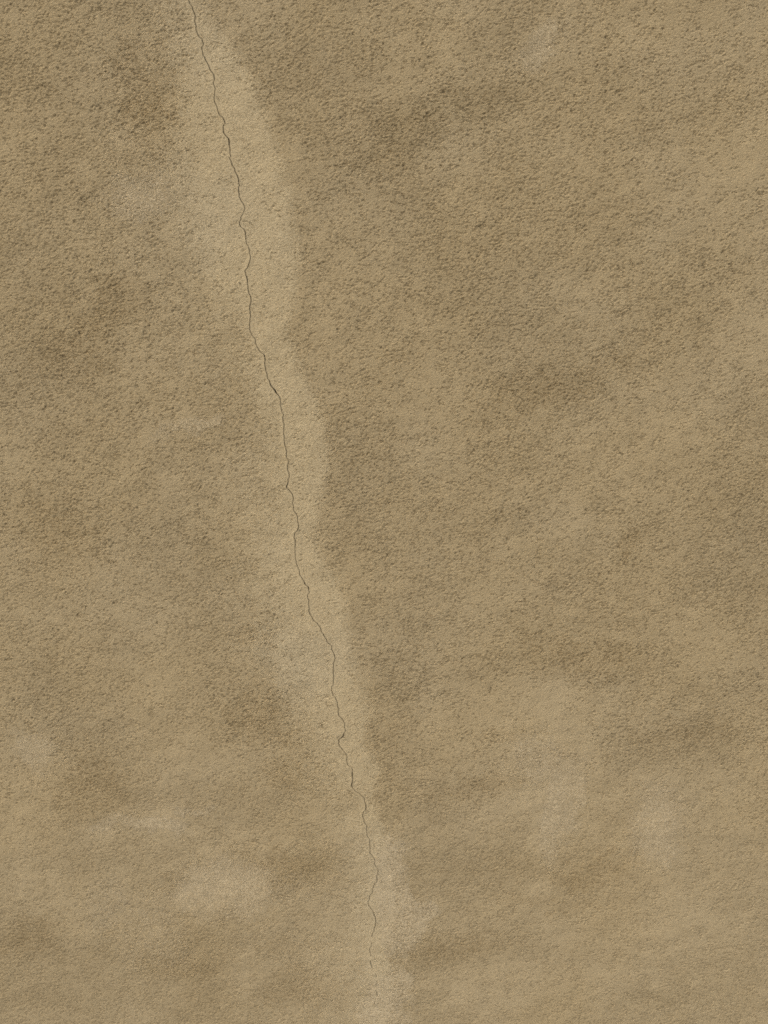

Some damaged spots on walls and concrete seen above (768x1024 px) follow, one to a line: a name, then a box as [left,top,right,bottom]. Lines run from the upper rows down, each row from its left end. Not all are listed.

crack [189,1,378,1004]